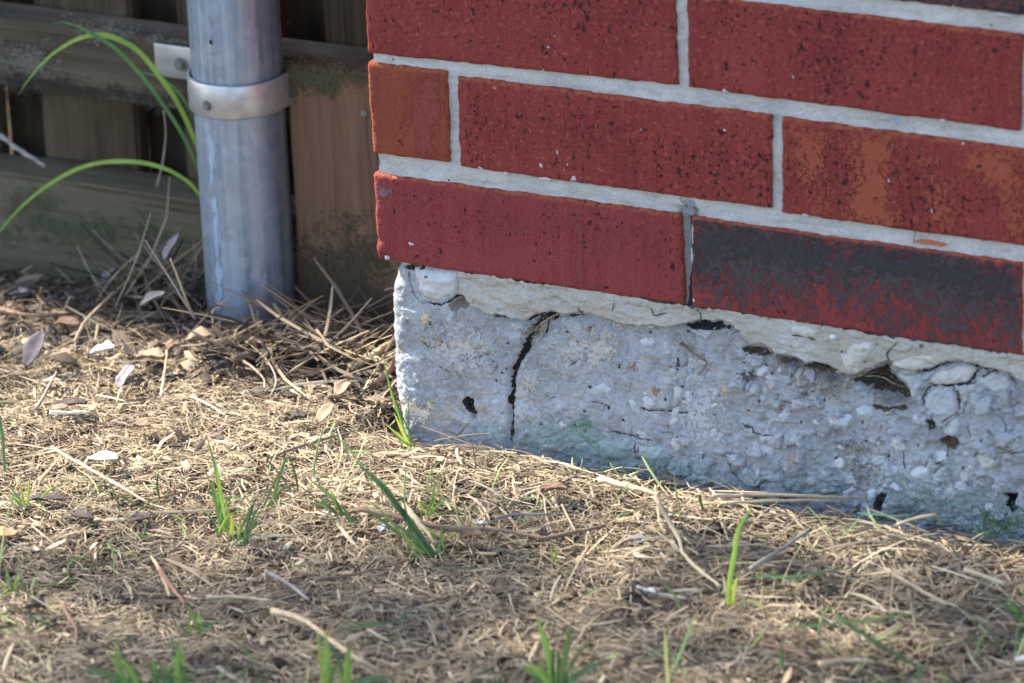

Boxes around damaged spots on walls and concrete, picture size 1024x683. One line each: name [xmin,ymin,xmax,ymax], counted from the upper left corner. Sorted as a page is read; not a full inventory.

crack [494,307,584,441]
spalling [686,319,743,333]
spalling [742,346,1012,514]
crack [919,361,1024,465]